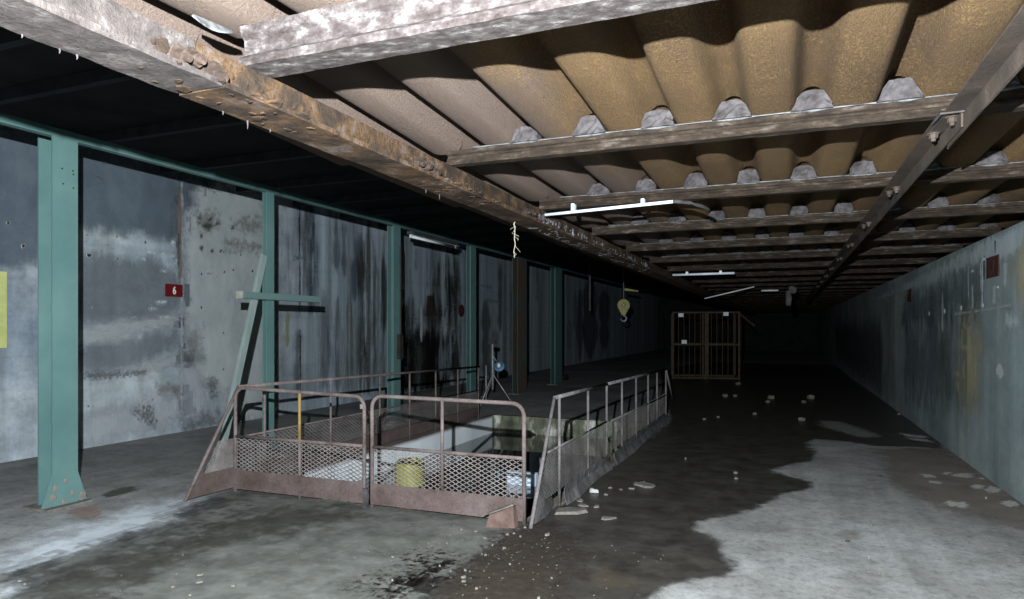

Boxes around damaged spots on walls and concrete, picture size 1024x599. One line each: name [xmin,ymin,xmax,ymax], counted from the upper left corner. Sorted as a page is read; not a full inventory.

rust [150,37,182,66]
water stain [78,147,280,446]
water stain [299,206,387,394]
water stain [401,244,461,392]
water stain [873,224,1024,402]
water stain [0,322,941,599]